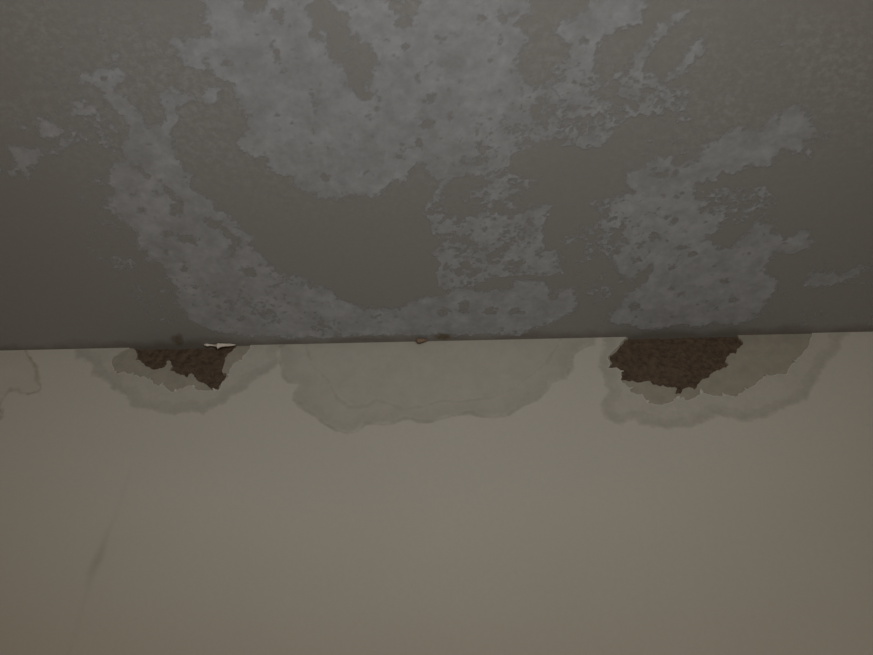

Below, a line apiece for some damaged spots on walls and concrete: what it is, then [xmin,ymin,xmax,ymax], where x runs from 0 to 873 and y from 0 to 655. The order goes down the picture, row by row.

water stain [0,0,829,339]
peeling [111,343,251,393]
peeling [607,333,813,406]